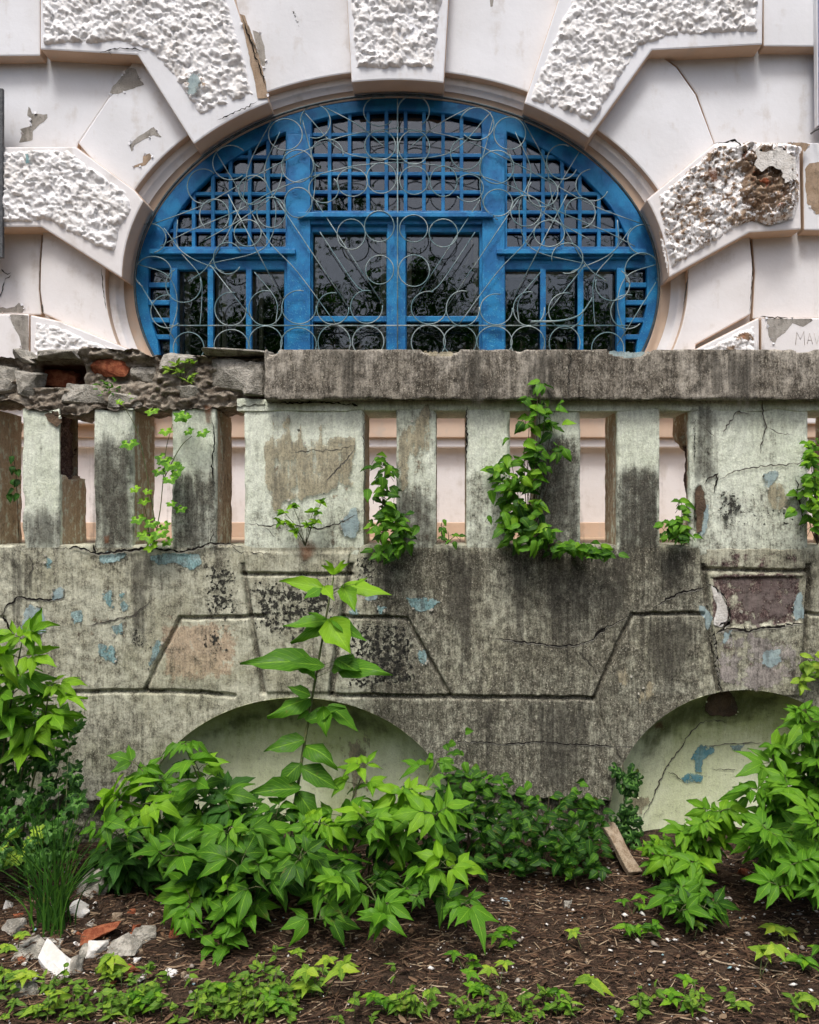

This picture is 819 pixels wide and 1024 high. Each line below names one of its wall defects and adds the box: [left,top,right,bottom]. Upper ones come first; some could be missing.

crack [218,16,266,120]
peeling [19,107,47,143]
spalling [732,141,819,225]
spalling [0,303,274,427]
peeling [765,317,812,345]
crack [55,401,366,556]
damp [621,471,656,544]
crack [693,401,803,531]
damp [203,557,333,659]
crack [489,548,803,691]
flaking render [699,574,804,717]
crack [643,720,761,818]